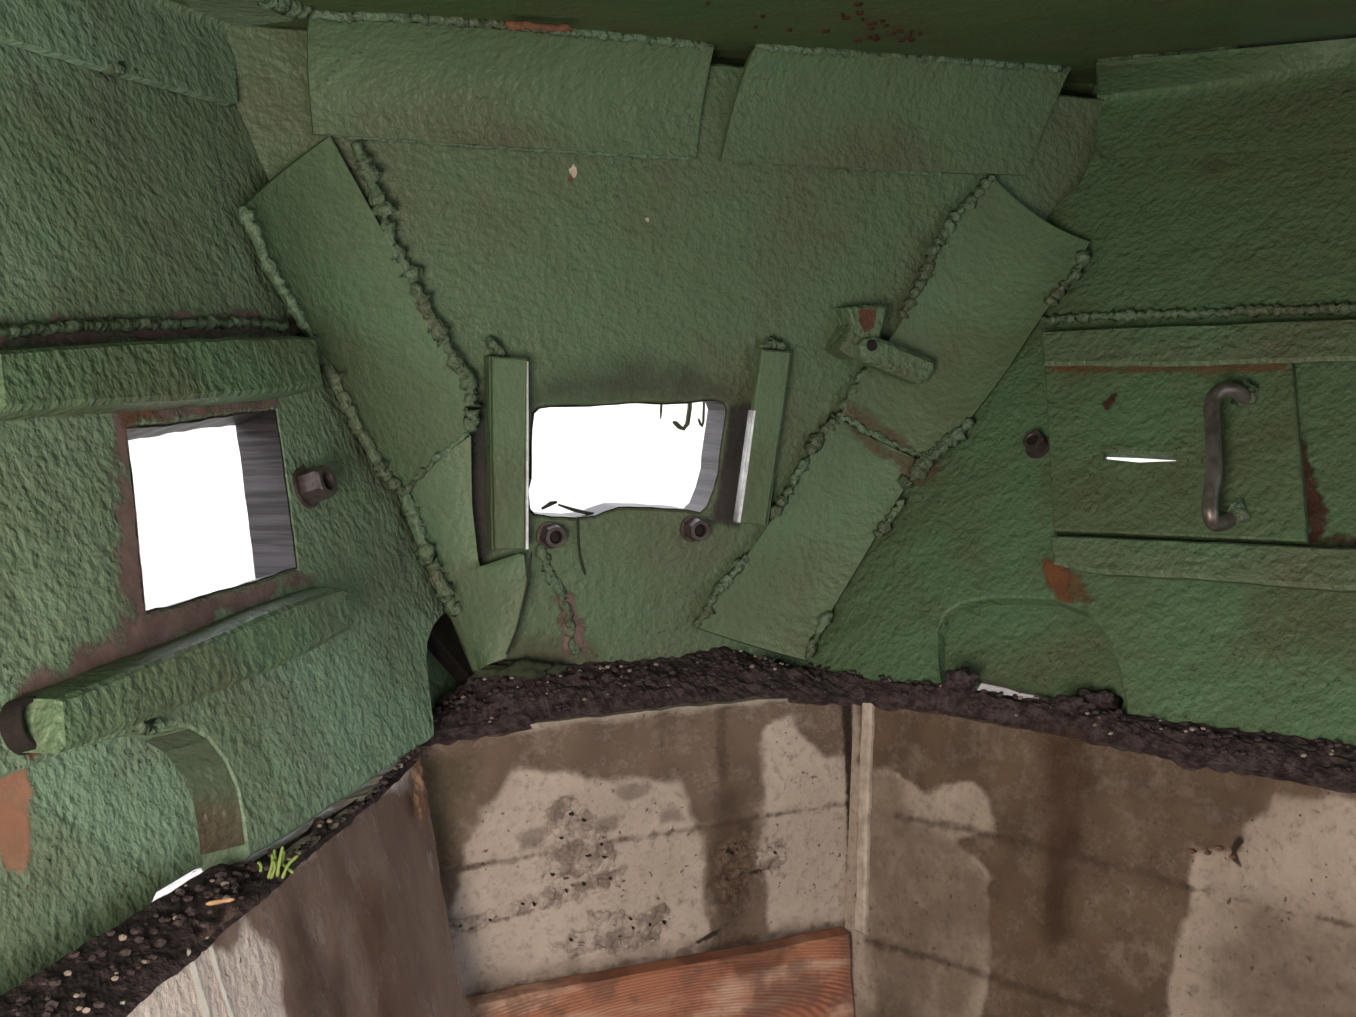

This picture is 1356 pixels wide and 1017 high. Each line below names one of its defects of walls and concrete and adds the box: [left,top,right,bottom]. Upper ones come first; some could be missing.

rust [504,20,574,33]
rust [859,309,876,332]
rust [1301,440,1356,546]
rust [1043,559,1087,603]
rust [0,753,37,869]
spalling [449,796,670,959]
damp [187,703,1327,1017]